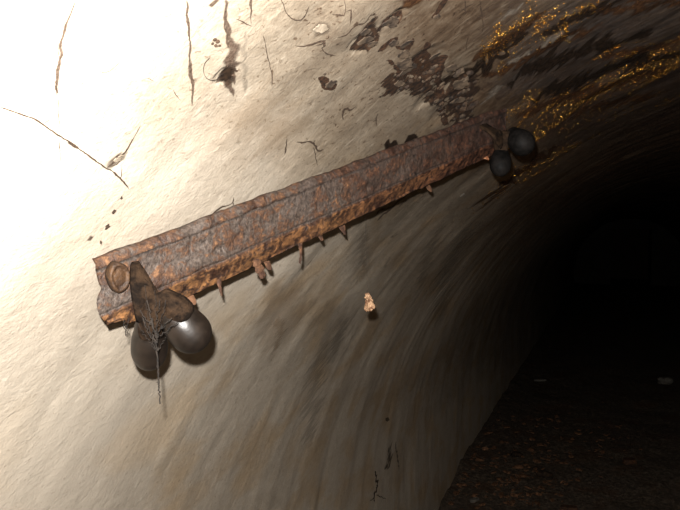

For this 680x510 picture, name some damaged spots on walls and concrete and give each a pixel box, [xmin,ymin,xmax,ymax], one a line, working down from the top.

damp [216,0,239,95]
spalling [318,73,337,90]
spalling [349,0,481,126]
damp [443,0,652,105]
damp [533,49,680,104]
crack [1,99,140,187]